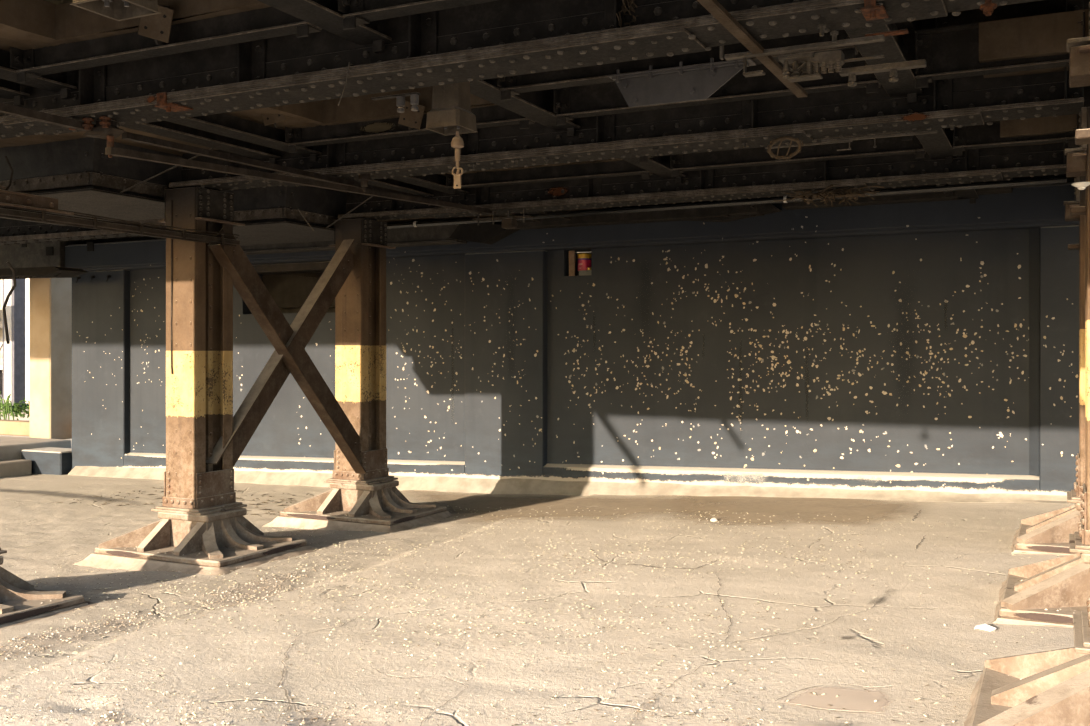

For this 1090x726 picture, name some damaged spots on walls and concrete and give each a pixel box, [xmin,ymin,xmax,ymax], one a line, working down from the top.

peeling [387,251,542,471]
peeling [558,250,1029,487]